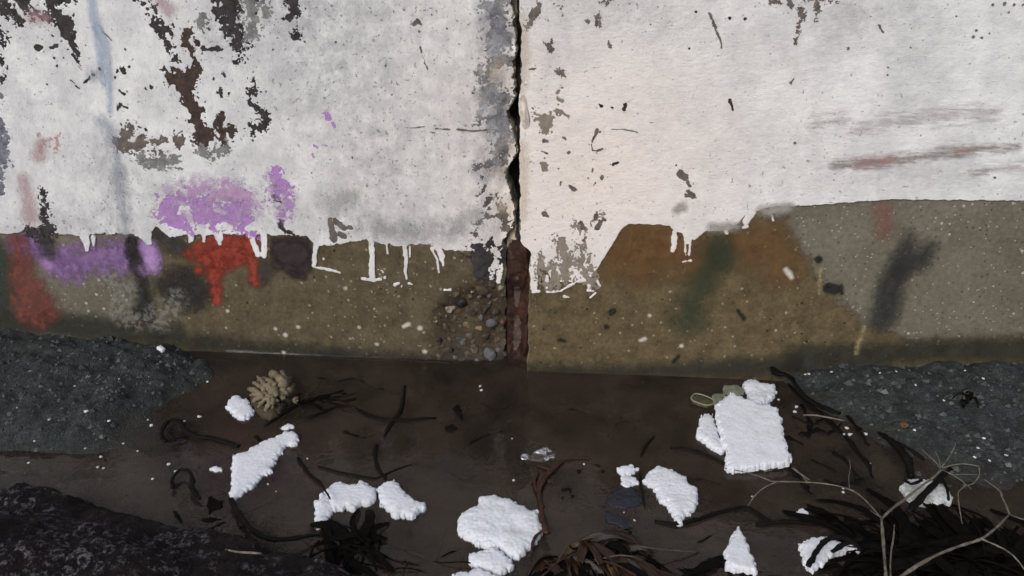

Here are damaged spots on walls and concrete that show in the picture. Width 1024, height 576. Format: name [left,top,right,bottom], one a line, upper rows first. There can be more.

peeling [112,0,306,175]
crack [509,0,522,239]
corrosion [506,232,531,369]